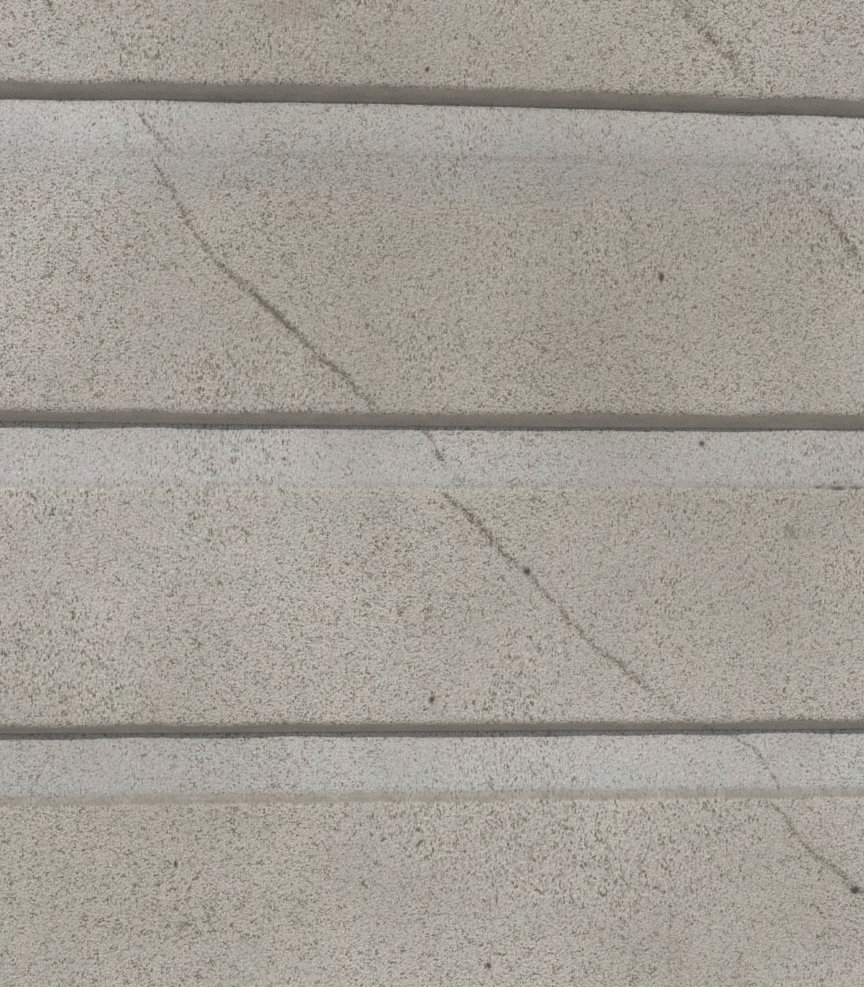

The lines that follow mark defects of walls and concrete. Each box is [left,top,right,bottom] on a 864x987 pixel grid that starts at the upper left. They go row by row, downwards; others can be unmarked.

crack [676,1,743,82]
crack [142,114,377,408]
crack [767,112,864,270]
crack [418,426,667,703]
crack [704,726,863,895]